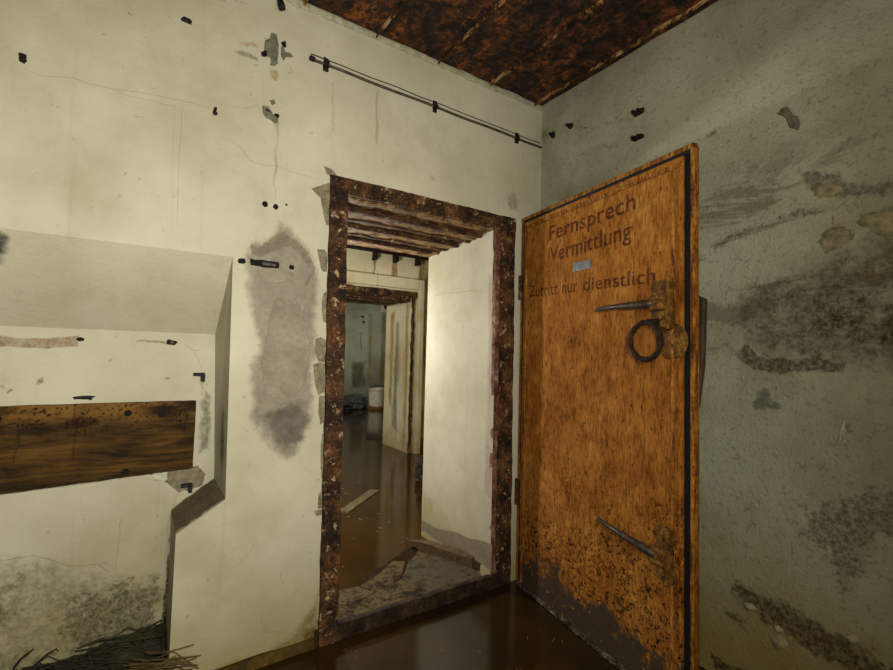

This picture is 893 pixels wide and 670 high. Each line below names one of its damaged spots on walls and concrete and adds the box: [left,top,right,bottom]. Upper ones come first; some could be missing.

flaking render [262,33,293,68]
flaking render [262,99,281,124]
flaking render [777,106,802,130]
flaking render [804,172,891,199]
flaking render [819,209,893,254]
flaking render [150,465,225,531]
water stain [731,584,893,670]